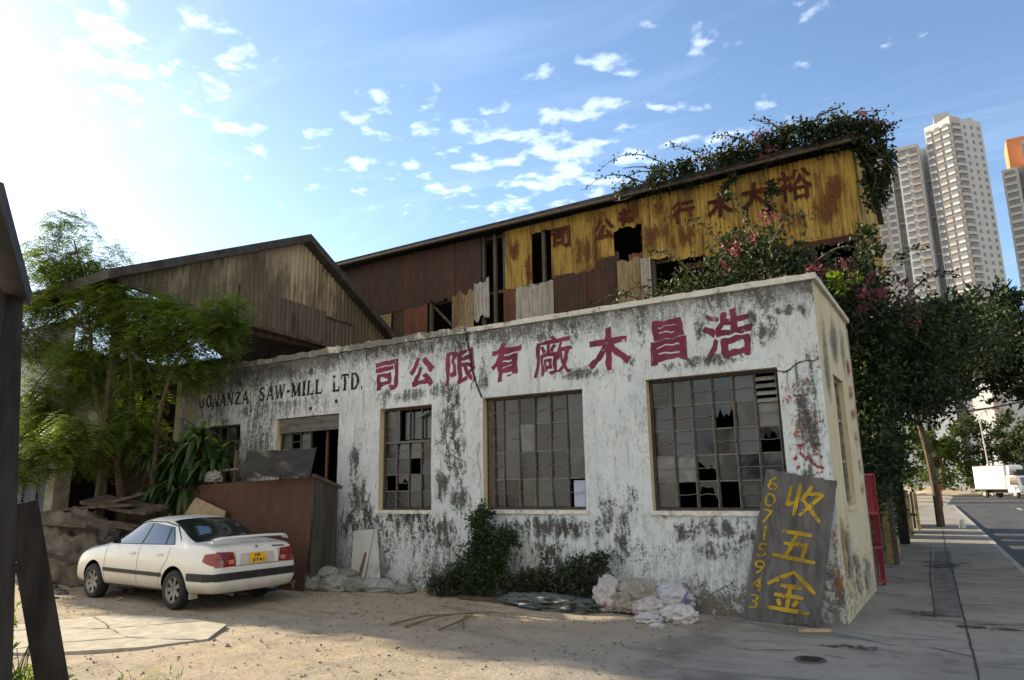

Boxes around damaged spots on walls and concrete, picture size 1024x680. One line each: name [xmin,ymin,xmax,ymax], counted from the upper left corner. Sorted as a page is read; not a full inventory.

corrosion [778,171,842,237]
damp [747,304,805,346]
crack [460,327,482,398]
crack [777,350,818,394]
damp [366,384,471,588]
damp [499,486,638,592]
damp [674,518,755,560]